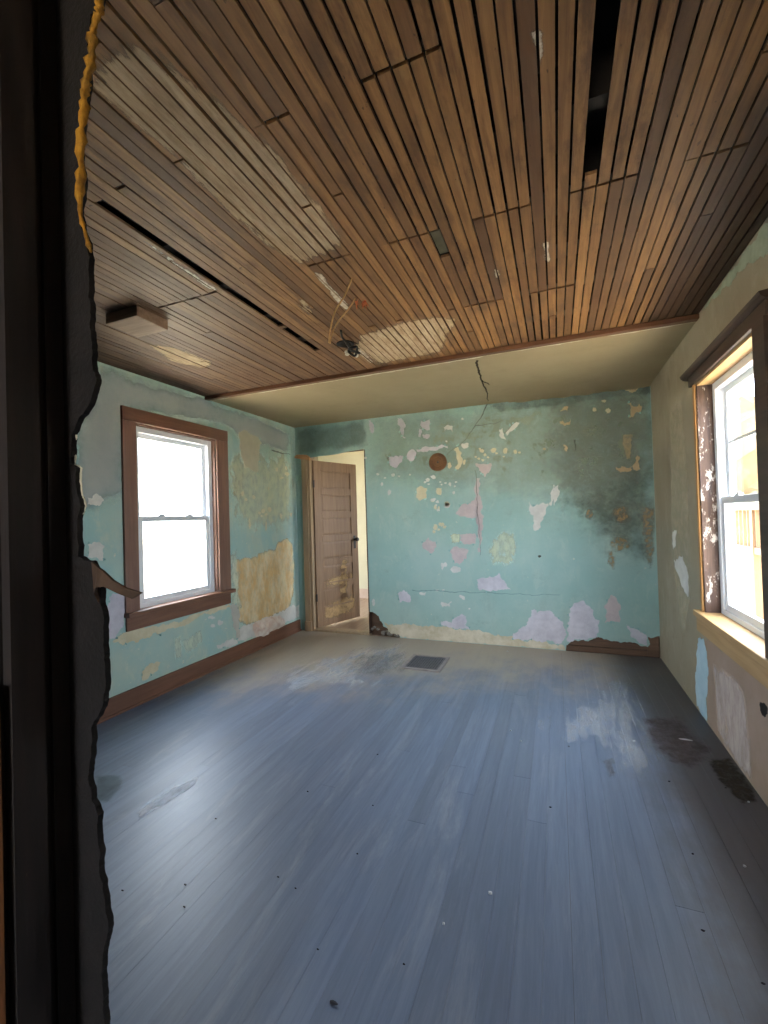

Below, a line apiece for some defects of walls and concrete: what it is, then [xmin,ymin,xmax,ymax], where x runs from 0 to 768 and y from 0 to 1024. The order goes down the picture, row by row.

damp [94,46,340,263]
crack [447,360,519,455]
peeling [376,418,521,573]
peeling [527,485,560,531]
damp [551,397,646,543]
peeling [477,573,510,593]
flaking render [371,589,660,658]
peeling [672,530,689,597]
damp [648,673,755,803]